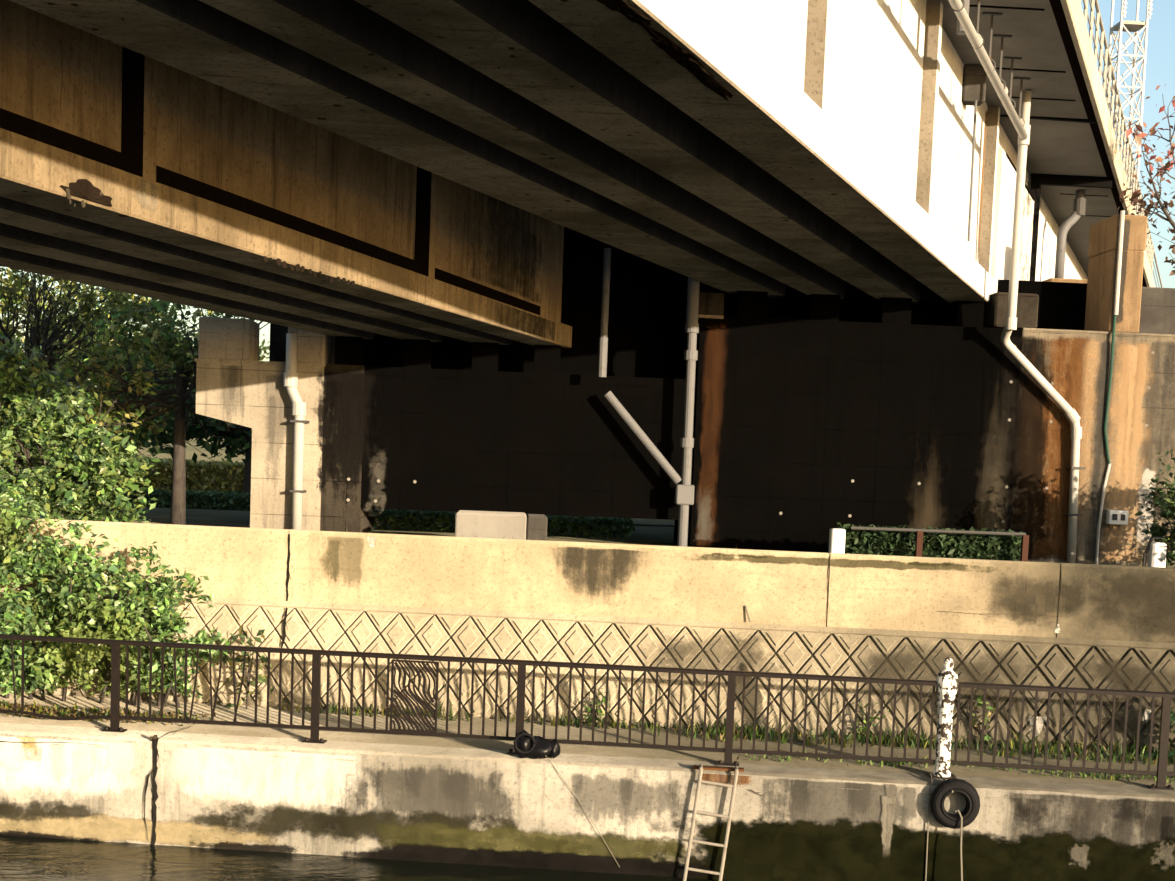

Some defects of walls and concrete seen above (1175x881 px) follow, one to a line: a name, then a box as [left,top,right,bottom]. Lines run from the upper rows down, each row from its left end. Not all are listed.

spalling [596,0,733,101]
spalling [60,179,112,208]
corrosion [697,325,726,547]
water stain [995,338,1017,512]
corrosion [1014,338,1089,560]
water stain [1080,343,1149,561]
crack [281,534,291,648]
water stain [563,548,638,594]
water stain [702,553,967,571]
water stain [0,768,710,878]
water stain [766,780,1002,881]
water stain [1018,794,1175,846]